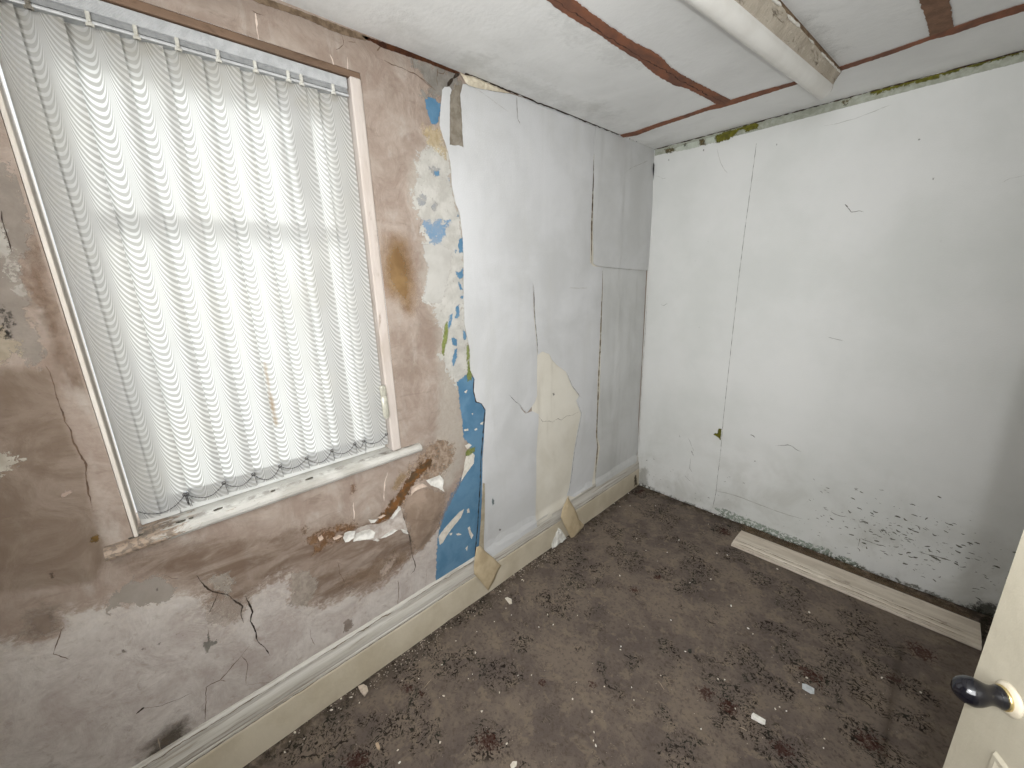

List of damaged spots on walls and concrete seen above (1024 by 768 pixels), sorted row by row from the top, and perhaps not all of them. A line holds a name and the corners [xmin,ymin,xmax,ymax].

water stain [382,236,415,313]
peeling [407,58,486,580]
crack [46,367,92,505]
water stain [20,606,59,640]
crack [136,576,269,717]
flaking render [318,506,408,542]
water stain [342,550,408,586]
mould [639,479,1016,618]